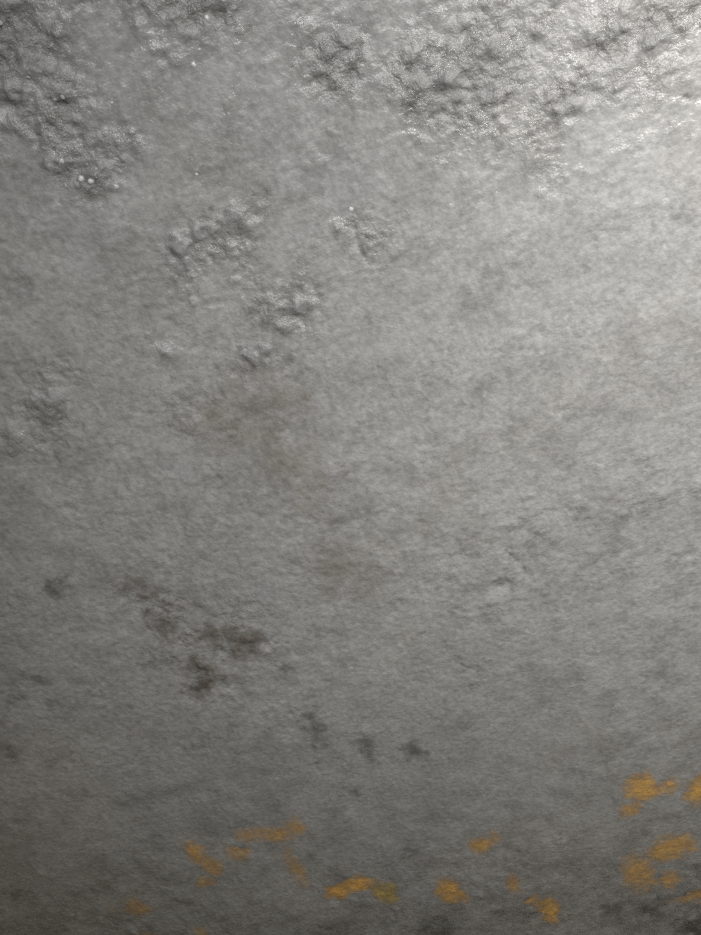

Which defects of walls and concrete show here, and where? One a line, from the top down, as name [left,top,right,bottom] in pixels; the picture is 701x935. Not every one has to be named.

corrosion [329,877,391,899]